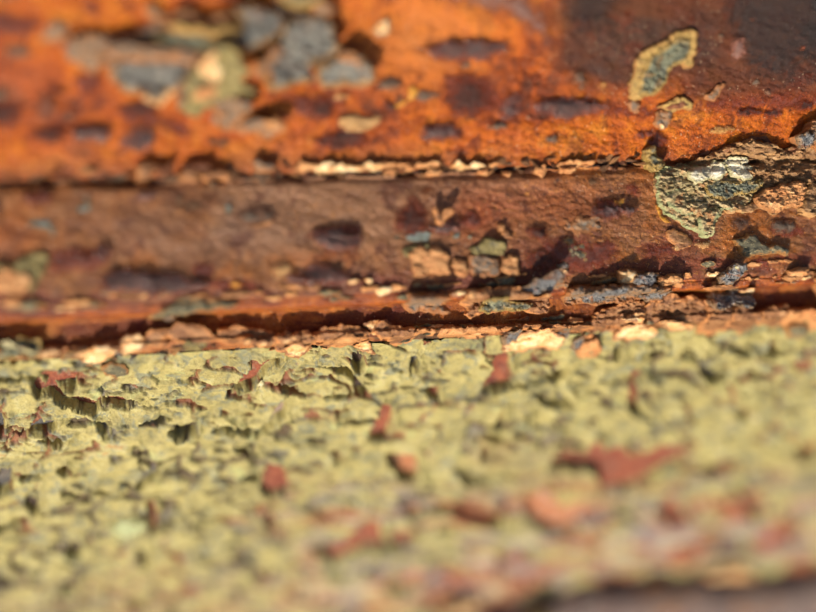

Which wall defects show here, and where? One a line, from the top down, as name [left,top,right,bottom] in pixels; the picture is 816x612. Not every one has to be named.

peeling [32,0,403,155]
peeling [627,29,700,101]
corrosion [338,115,381,132]
corrosion [294,160,512,177]
corrosion [432,208,454,226]
corrosion [533,159,595,178]
peeling [654,156,764,249]
corrosion [641,119,816,249]
peeling [139,262,407,322]
peeling [402,237,571,297]
corrosion [590,268,684,288]
peeling [700,259,792,285]